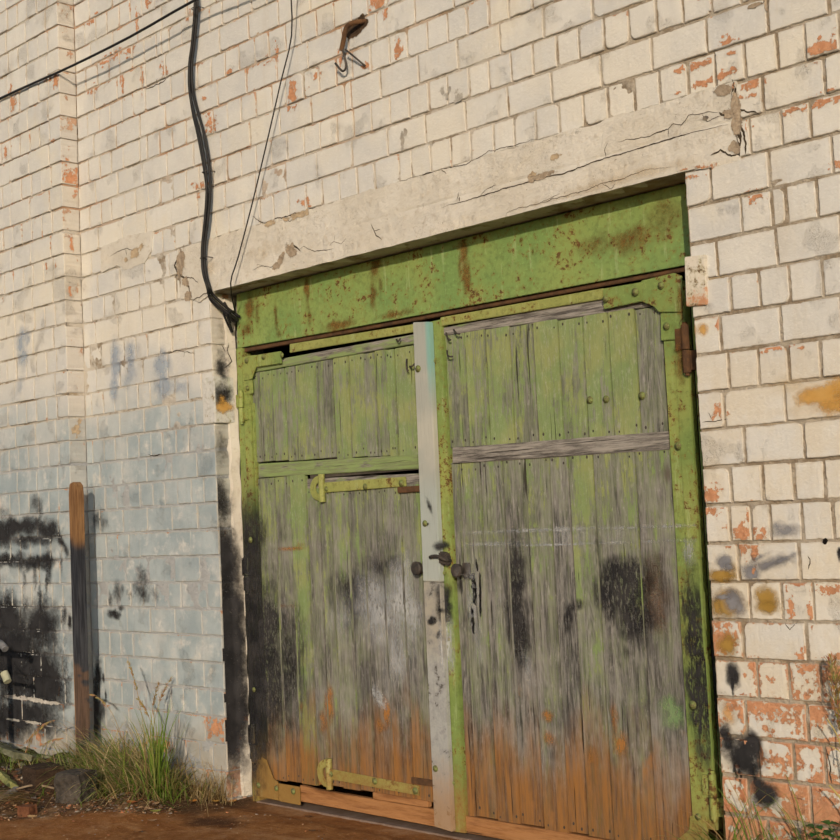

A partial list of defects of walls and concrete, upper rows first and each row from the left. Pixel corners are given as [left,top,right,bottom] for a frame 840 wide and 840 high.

spalling [691,66,767,155]
crack [401,139,535,181]
crack [447,80,758,224]
spalling [176,245,192,301]
crack [174,260,207,301]
corrosion [459,239,470,290]
damp [217,481,230,516]
peeling [722,499,767,574]
damp [39,552,51,609]
peeling [712,622,739,655]
peeling [727,644,840,744]
peeling [765,745,840,840]